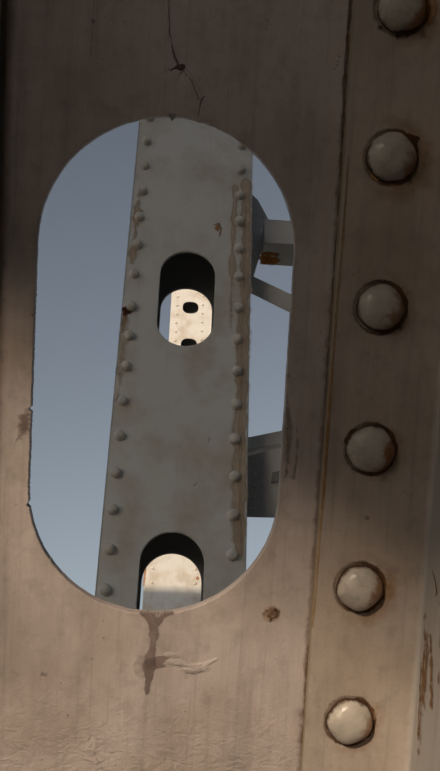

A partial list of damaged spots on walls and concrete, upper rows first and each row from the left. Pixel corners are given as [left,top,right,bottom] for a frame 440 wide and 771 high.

crack [164,0,205,114]
damp [140,611,218,694]